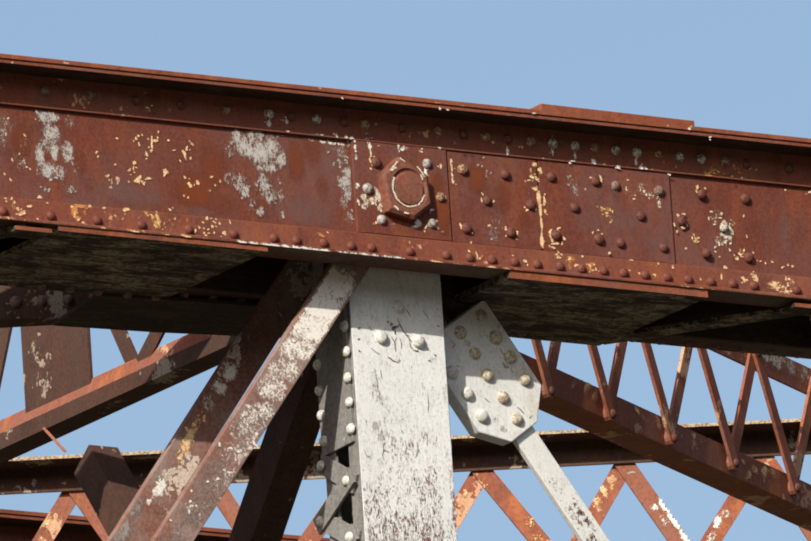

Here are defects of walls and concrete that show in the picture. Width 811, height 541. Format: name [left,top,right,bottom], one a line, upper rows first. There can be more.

peeling [0,110,80,223]
rust [70,204,91,224]
rust [179,150,230,207]
peeling [208,117,290,218]
peeling [237,240,417,260]
peeling [524,149,566,249]
rust [554,251,599,273]
peeling [708,206,795,294]
peeling [113,363,238,541]
peeling [160,265,358,541]
rust [358,347,457,541]
rust [544,476,597,541]